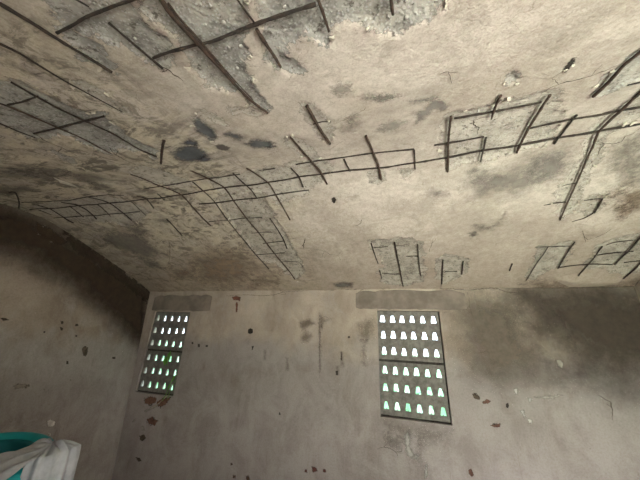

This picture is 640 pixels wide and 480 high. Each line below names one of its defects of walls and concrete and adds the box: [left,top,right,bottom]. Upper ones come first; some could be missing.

spalling [0,0,451,118]
damp [174,138,210,162]
damp [193,118,276,151]
spalling [0,43,640,287]
damp [0,205,148,342]
damp [463,301,541,378]
damp [514,280,640,382]